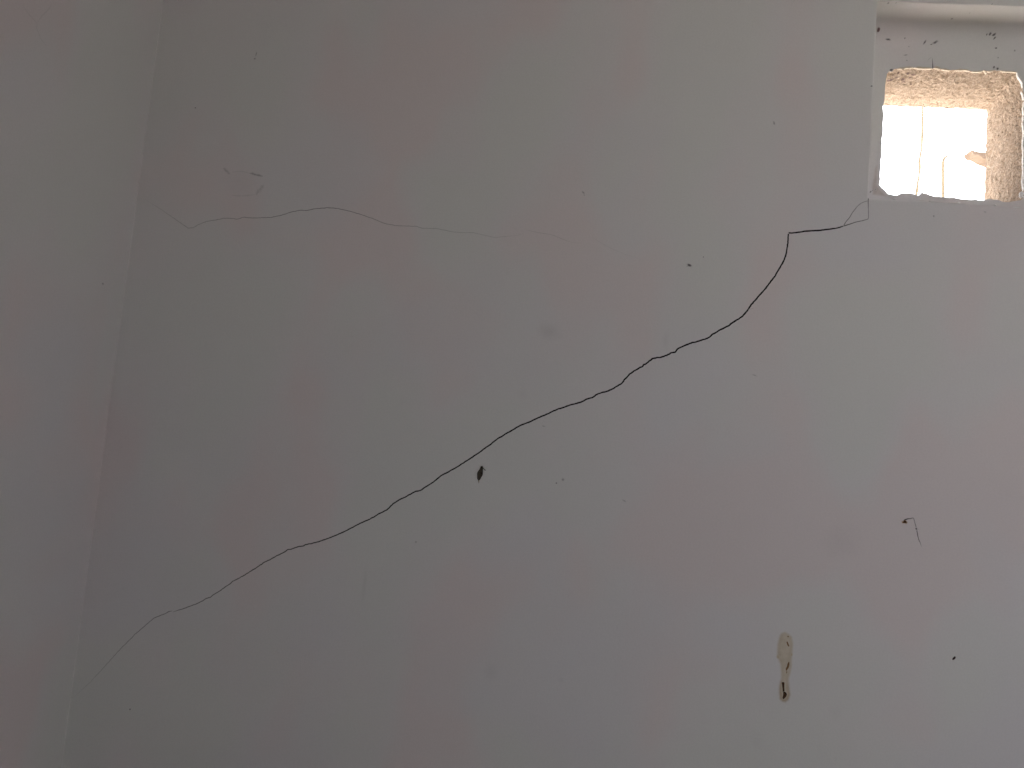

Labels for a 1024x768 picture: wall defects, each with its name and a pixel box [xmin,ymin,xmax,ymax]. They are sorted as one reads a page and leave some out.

crack [72,198,869,698]